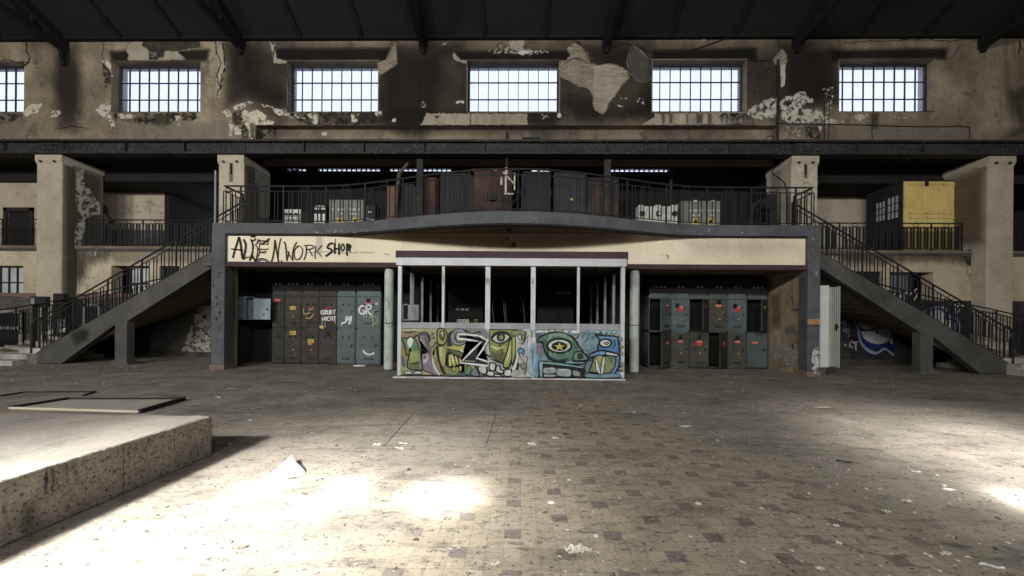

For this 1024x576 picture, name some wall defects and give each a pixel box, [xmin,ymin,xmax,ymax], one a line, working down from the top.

flaking render [377,43,397,75]
flaking render [489,40,549,55]
flaking render [558,40,644,114]
flaking render [642,48,868,139]
peeling [222,101,305,139]
flaking render [421,100,528,126]
peeling [74,168,164,256]